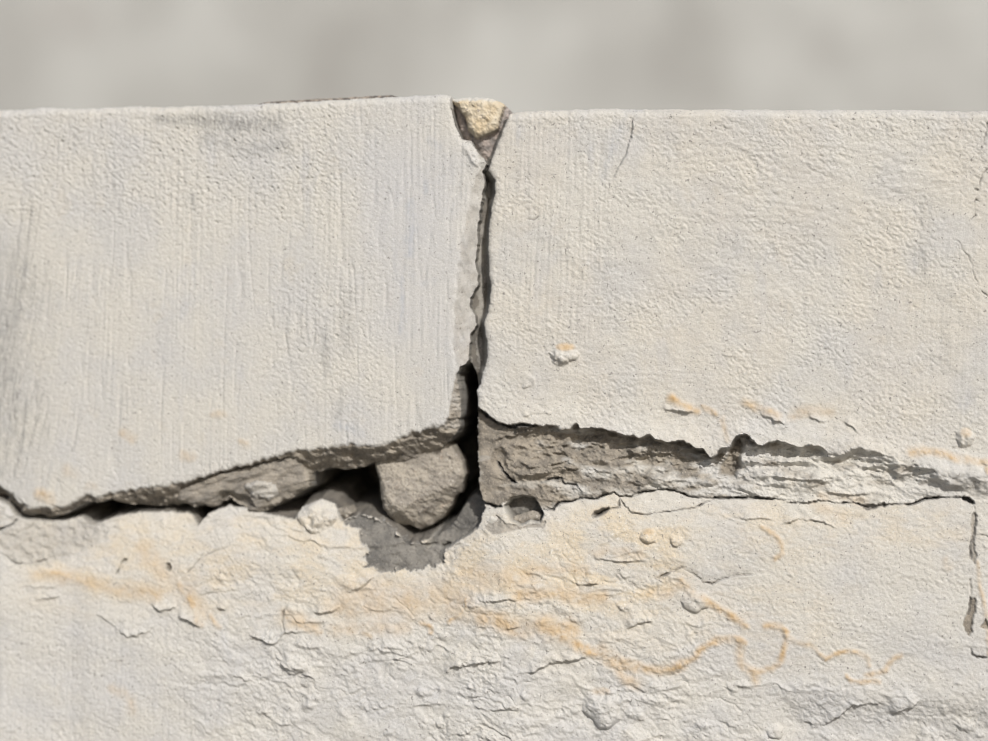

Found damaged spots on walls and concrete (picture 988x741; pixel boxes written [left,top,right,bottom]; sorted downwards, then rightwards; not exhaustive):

crack [615,121,635,175]
crack [480,159,490,240]
crack [953,110,988,298]
crack [471,282,487,375]
crack [0,406,988,615]
spalling [344,410,984,574]
crack [281,602,290,636]
peeling [963,598,988,637]
crack [969,647,988,660]